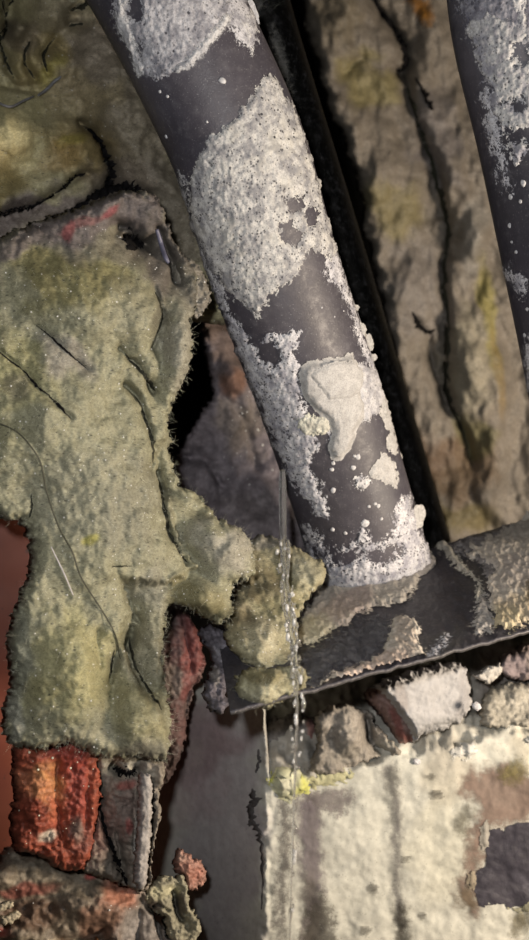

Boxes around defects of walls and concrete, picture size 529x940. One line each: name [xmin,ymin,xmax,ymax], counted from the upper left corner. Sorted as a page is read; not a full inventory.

water stain [110,0,529,689]
water stain [266,763,355,940]
water stain [385,766,408,940]
water stain [455,805,470,833]
peeling [466,820,529,913]